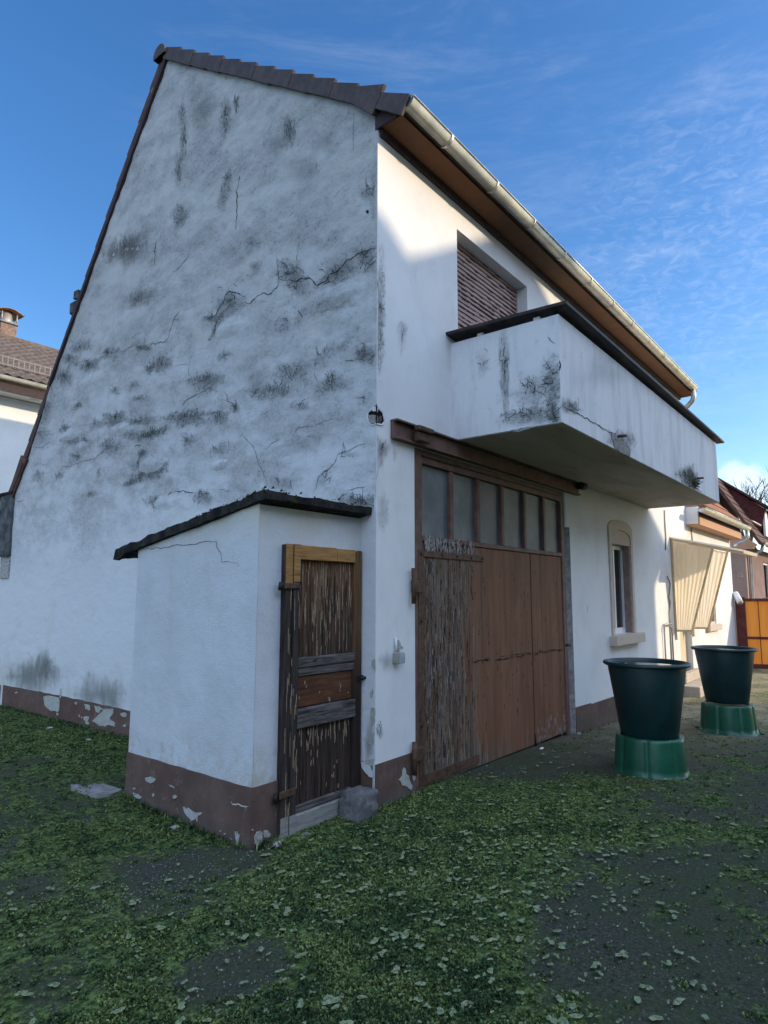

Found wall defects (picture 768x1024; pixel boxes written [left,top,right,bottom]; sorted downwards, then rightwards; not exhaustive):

leakage [319,246,381,283]
leakage [345,274,385,363]
crack [180,248,375,478]
leakage [503,364,580,423]
leakage [169,408,224,442]
leakage [126,450,168,486]
crack [145,541,238,564]
peeling [43,688,62,715]
peeling [75,702,127,727]
flaking render [361,759,374,778]
peeling [169,785,202,822]
flaking render [219,829,271,845]